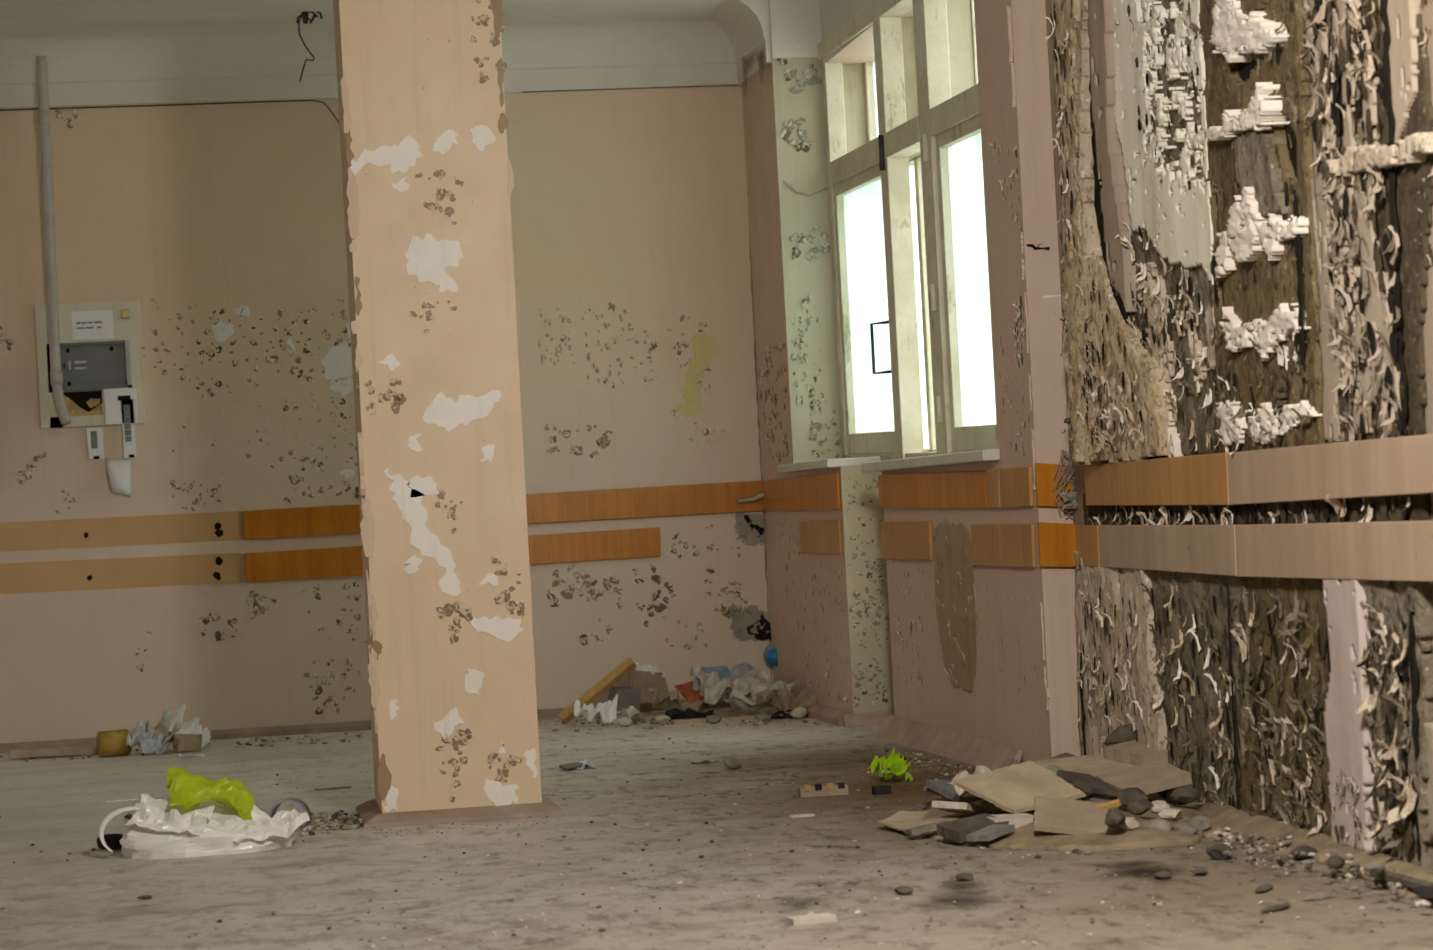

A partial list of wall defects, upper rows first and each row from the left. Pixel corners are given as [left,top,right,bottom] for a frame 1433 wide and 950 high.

flaking render [340,0,508,334]
spalling [64,390,103,416]
flaking render [407,390,502,452]
peeling [538,298,726,450]
peeling [757,292,842,462]
flaking render [142,276,407,734]
flaking render [383,468,525,643]
flaking render [546,512,771,650]
flaking render [1083,493,1431,527]
flaking render [434,707,472,803]
flaking render [484,742,538,806]
flaking render [1073,551,1433,870]